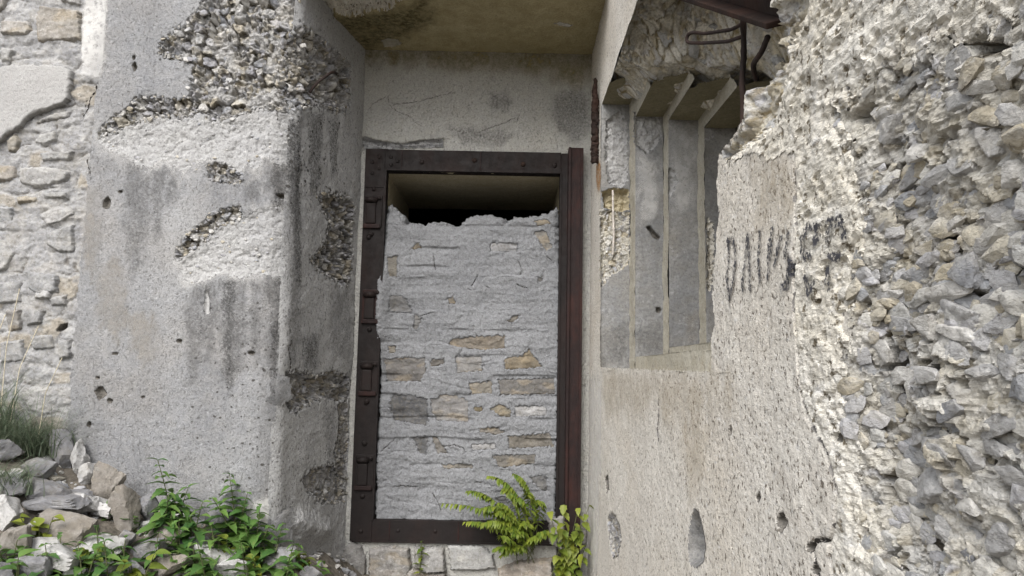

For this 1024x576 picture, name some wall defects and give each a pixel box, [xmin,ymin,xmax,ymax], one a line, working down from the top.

spalling [97,0,355,315]
rust [590,78,601,189]
water stain [186,282,280,389]
spalling [598,0,1024,576]
spalling [285,367,350,507]